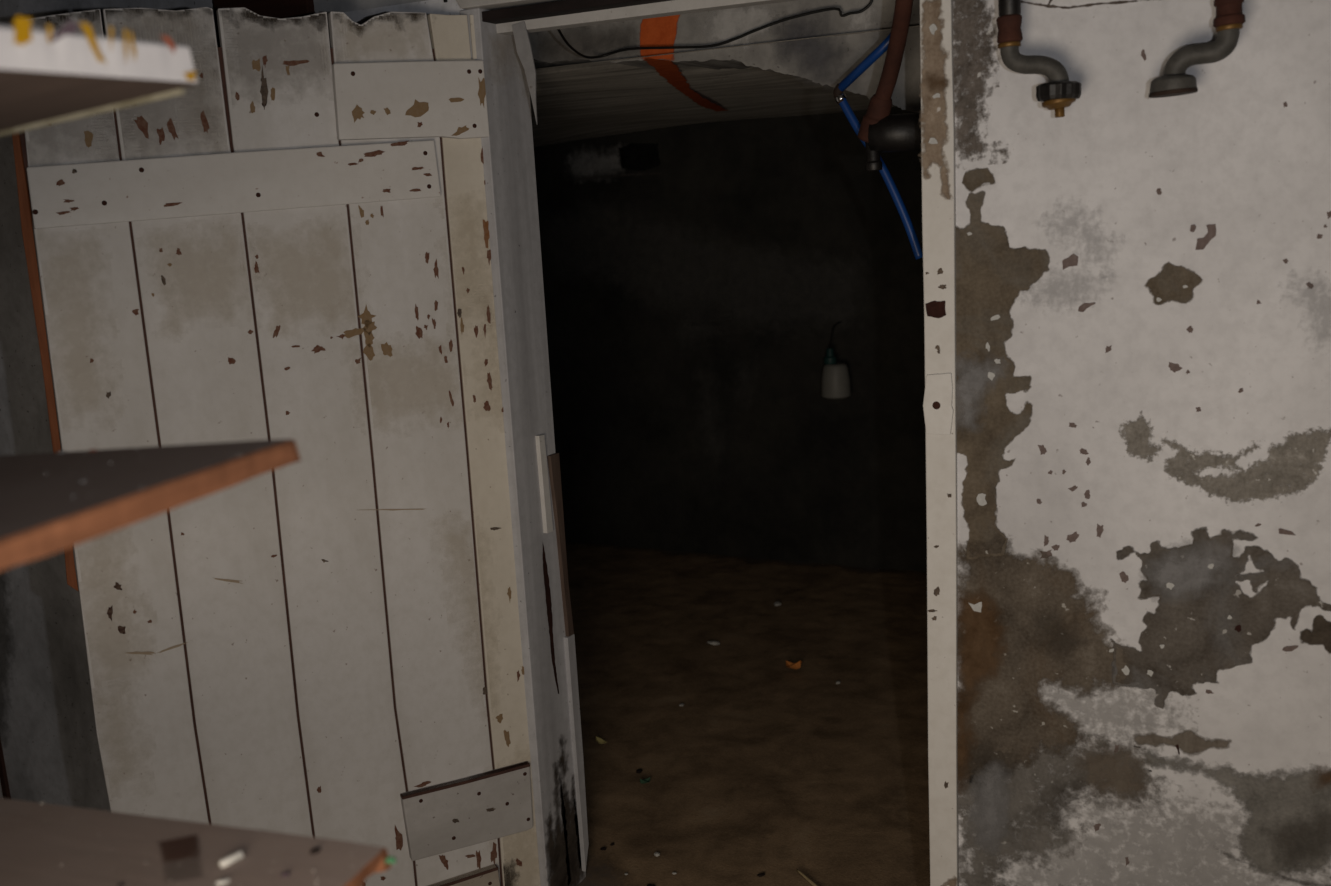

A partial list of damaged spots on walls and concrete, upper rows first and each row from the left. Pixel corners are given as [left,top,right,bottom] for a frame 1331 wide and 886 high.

peeling [926,168,1079,560]
peeling [1048,469,1090,507]
spalling [1145,262,1202,305]
peeling [1119,411,1331,503]
peeling [1111,523,1331,709]
leakage [957,535,1331,886]